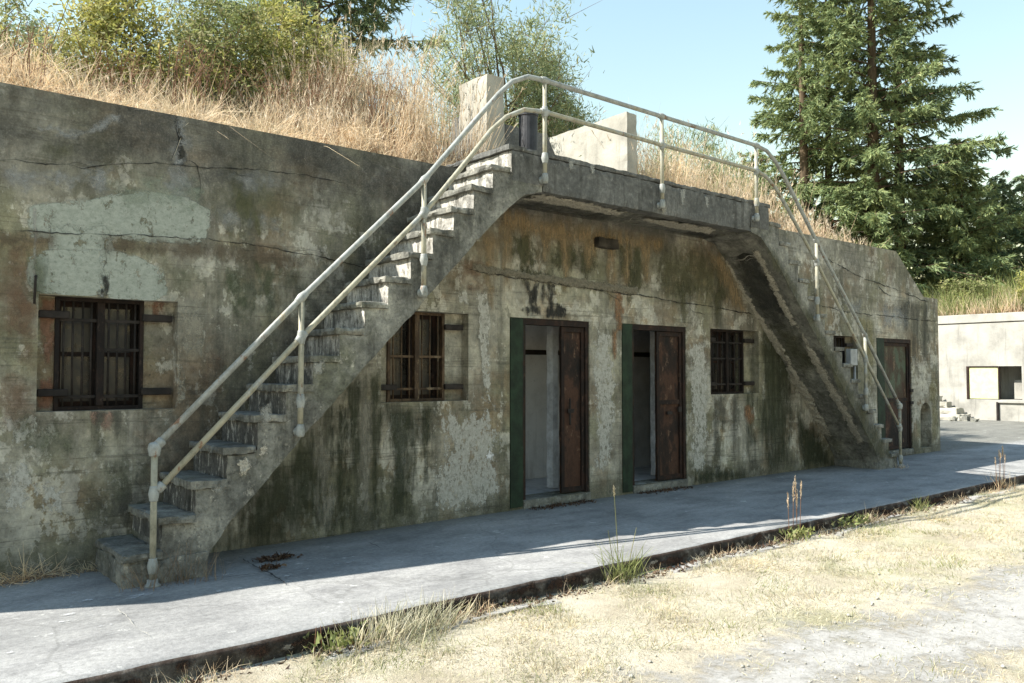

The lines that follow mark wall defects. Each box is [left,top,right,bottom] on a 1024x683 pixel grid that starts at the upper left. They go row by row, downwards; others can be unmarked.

crack [0,116,348,195]
peeling [26,191,210,301]
crack [15,230,364,277]
water stain [308,210,414,330]
water stain [484,205,663,319]
peeling [4,415,37,448]
water stain [221,355,276,412]
water stain [284,318,298,356]
water stain [315,378,381,529]
peeling [434,290,501,511]
corrosion [613,293,624,358]
peeling [690,342,710,471]